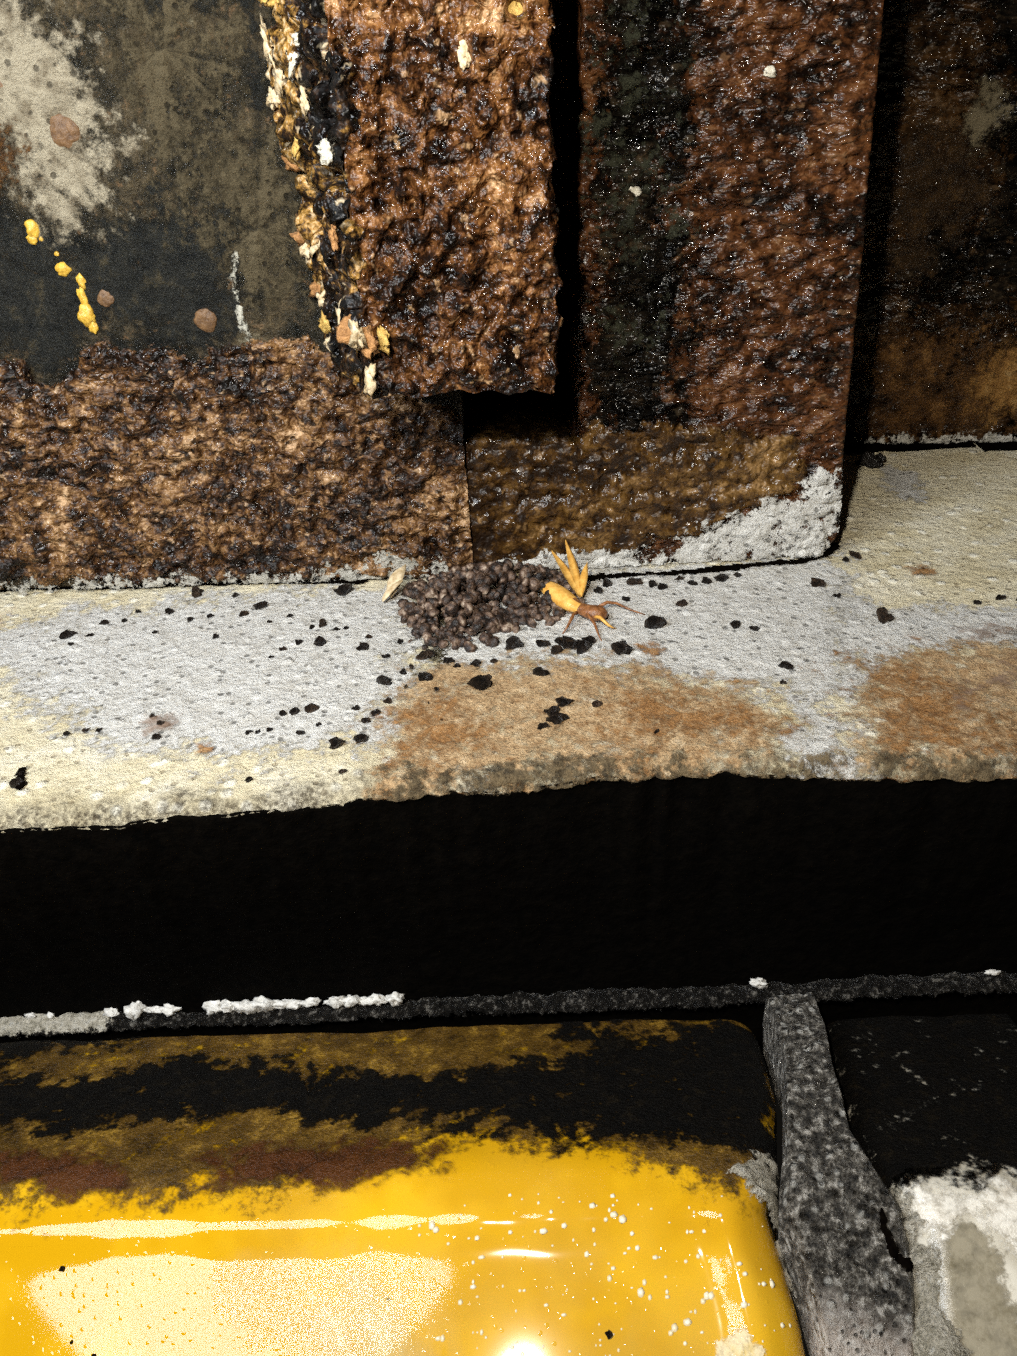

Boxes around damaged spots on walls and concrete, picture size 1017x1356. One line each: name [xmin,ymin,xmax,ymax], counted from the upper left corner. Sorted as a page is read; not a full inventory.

damp [239,0,267,144]
damp [862,0,1017,343]
damp [0,176,257,382]
corrosion [258,0,810,566]
damp [844,430,1017,444]
corrosion [847,306,1017,443]
corrosion [361,641,808,800]
corrosion [827,623,1017,782]
damp [0,1001,182,1068]
damp [202,991,405,1015]
damp [749,977,769,989]
damp [925,1222,1017,1356]